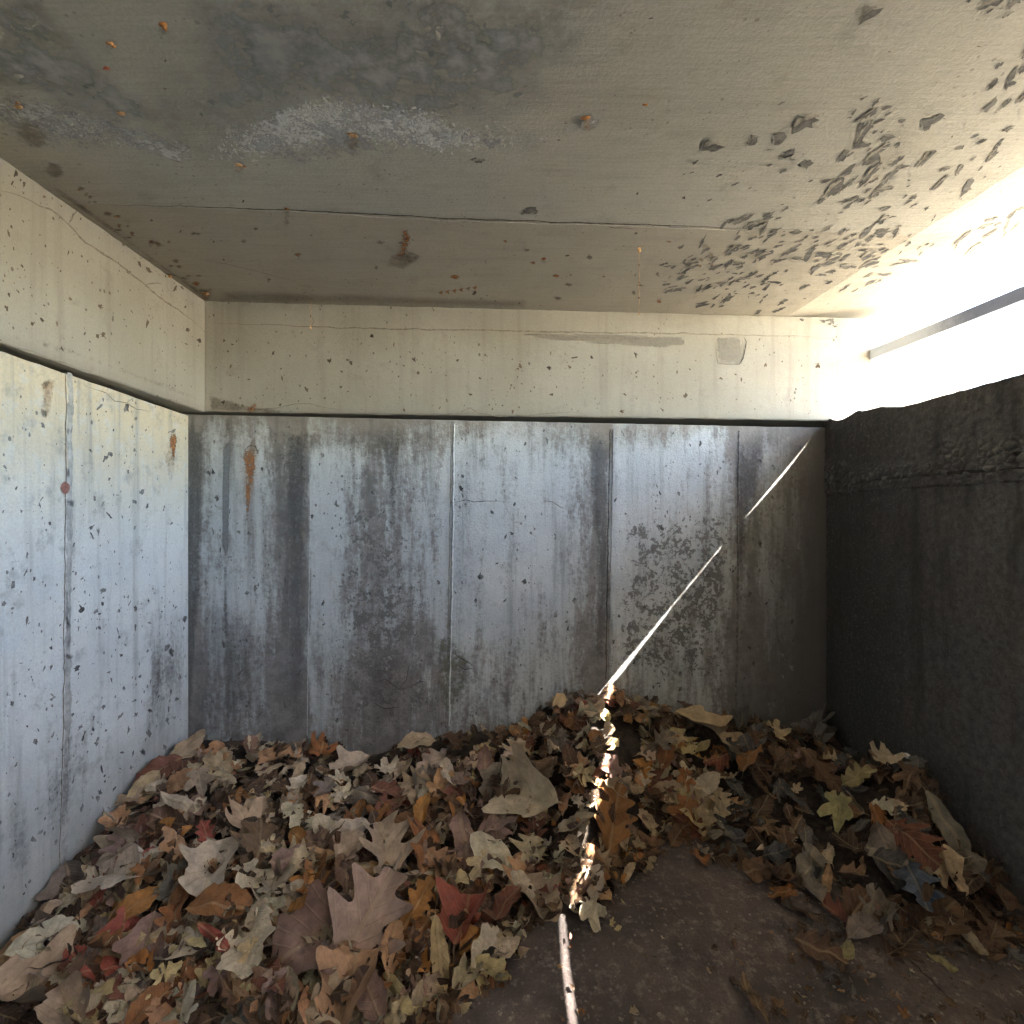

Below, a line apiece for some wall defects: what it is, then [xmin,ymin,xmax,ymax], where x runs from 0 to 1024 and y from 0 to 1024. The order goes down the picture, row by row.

damp [0,8,196,162]
damp [207,2,545,162]
crack [3,191,765,336]
peeling [659,96,937,315]
peeling [920,108,945,131]
peeling [929,125,1015,200]
peeling [953,207,1024,257]
damp [188,427,201,714]
damp [222,443,230,555]
corrosion [243,450,256,516]
damp [592,441,607,655]
damp [736,451,757,561]